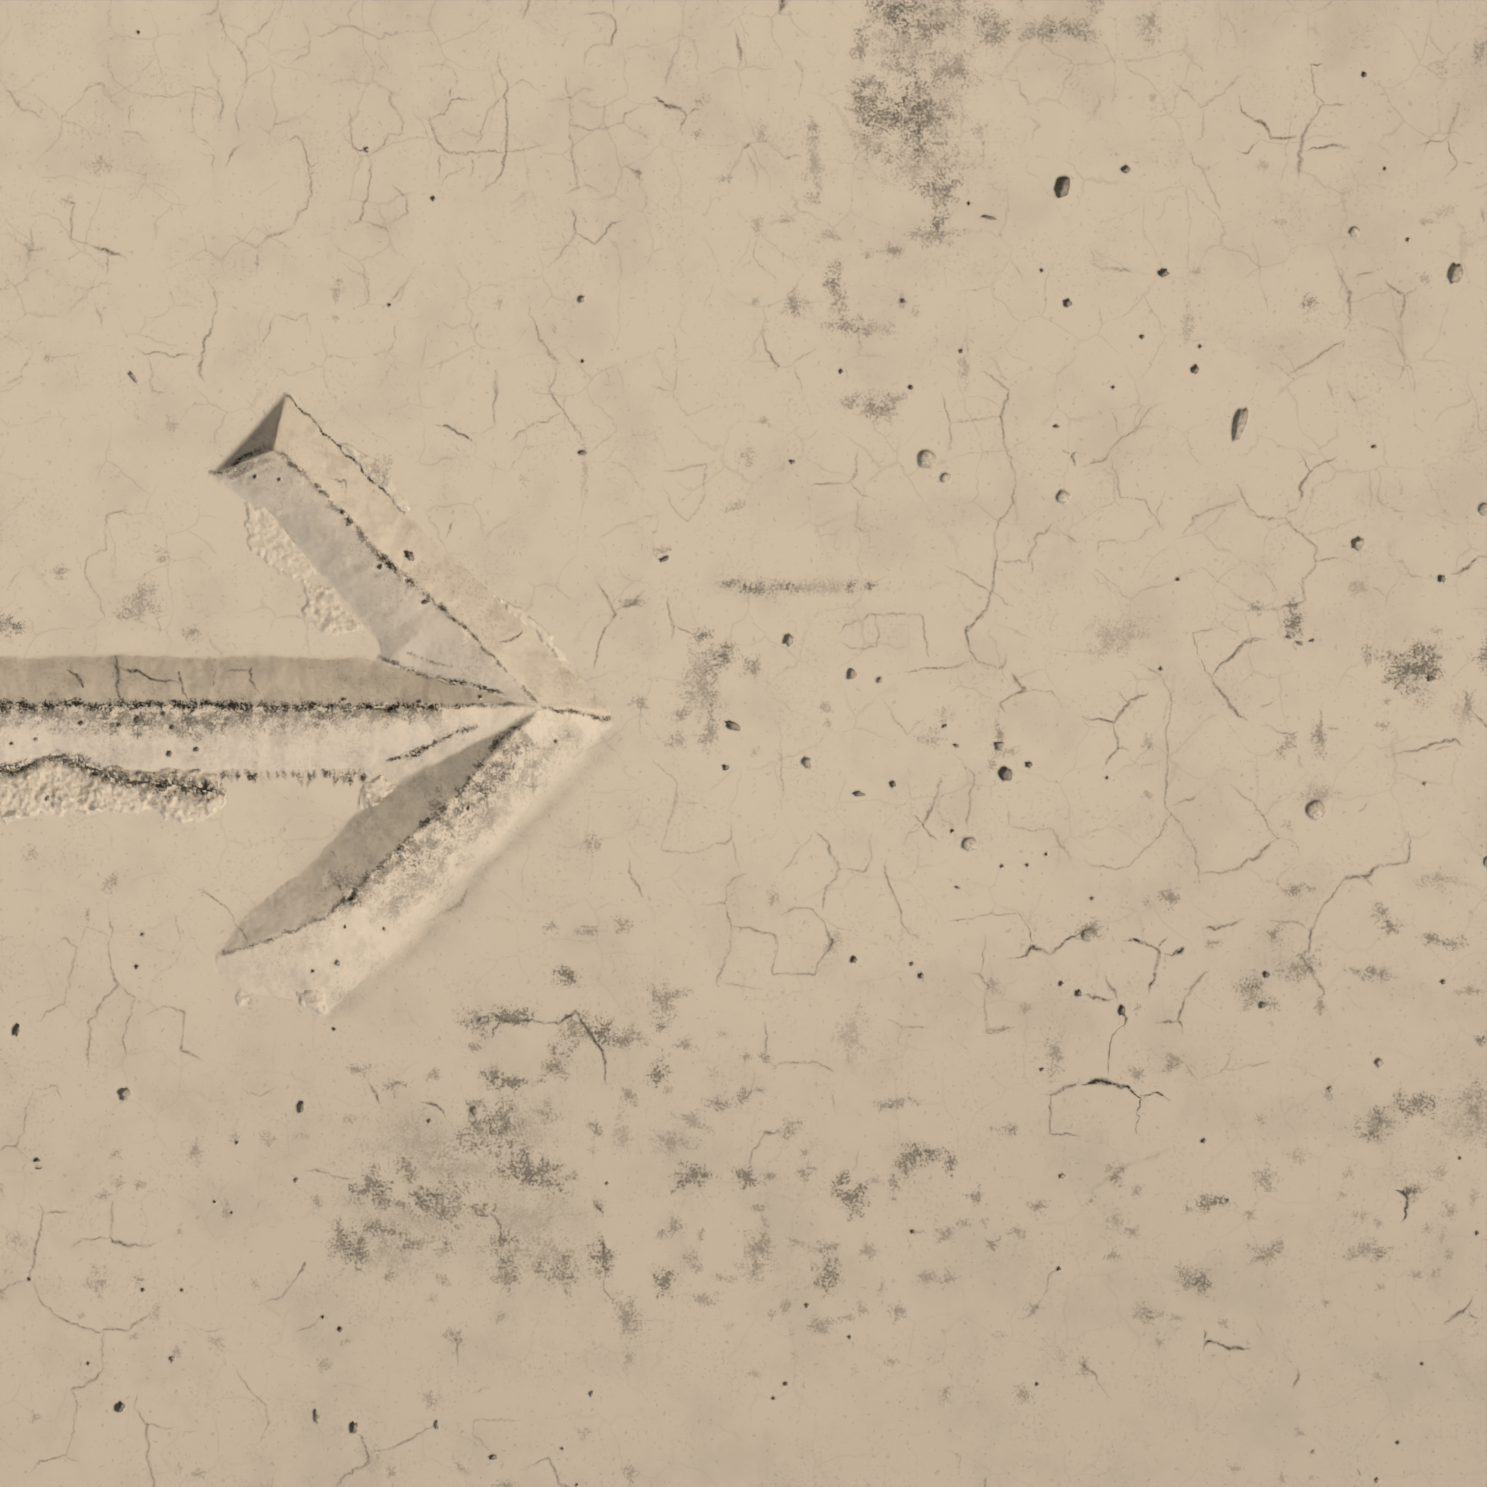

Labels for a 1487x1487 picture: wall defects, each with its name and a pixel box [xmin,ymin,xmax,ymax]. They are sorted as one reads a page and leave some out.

crack [68,661,183,697]
damp [476,1007,533,1025]
crack [477,1013,606,1064]
damp [573,1022,628,1044]
damp [481,1071,527,1090]
crack [1049,1079,1163,1135]
damp [349,1166,393,1203]
damp [498,1149,561,1192]
damp [736,1170,756,1189]
damp [833,1172,870,1217]
damp [898,1145,957,1177]
damp [653,1269,673,1298]